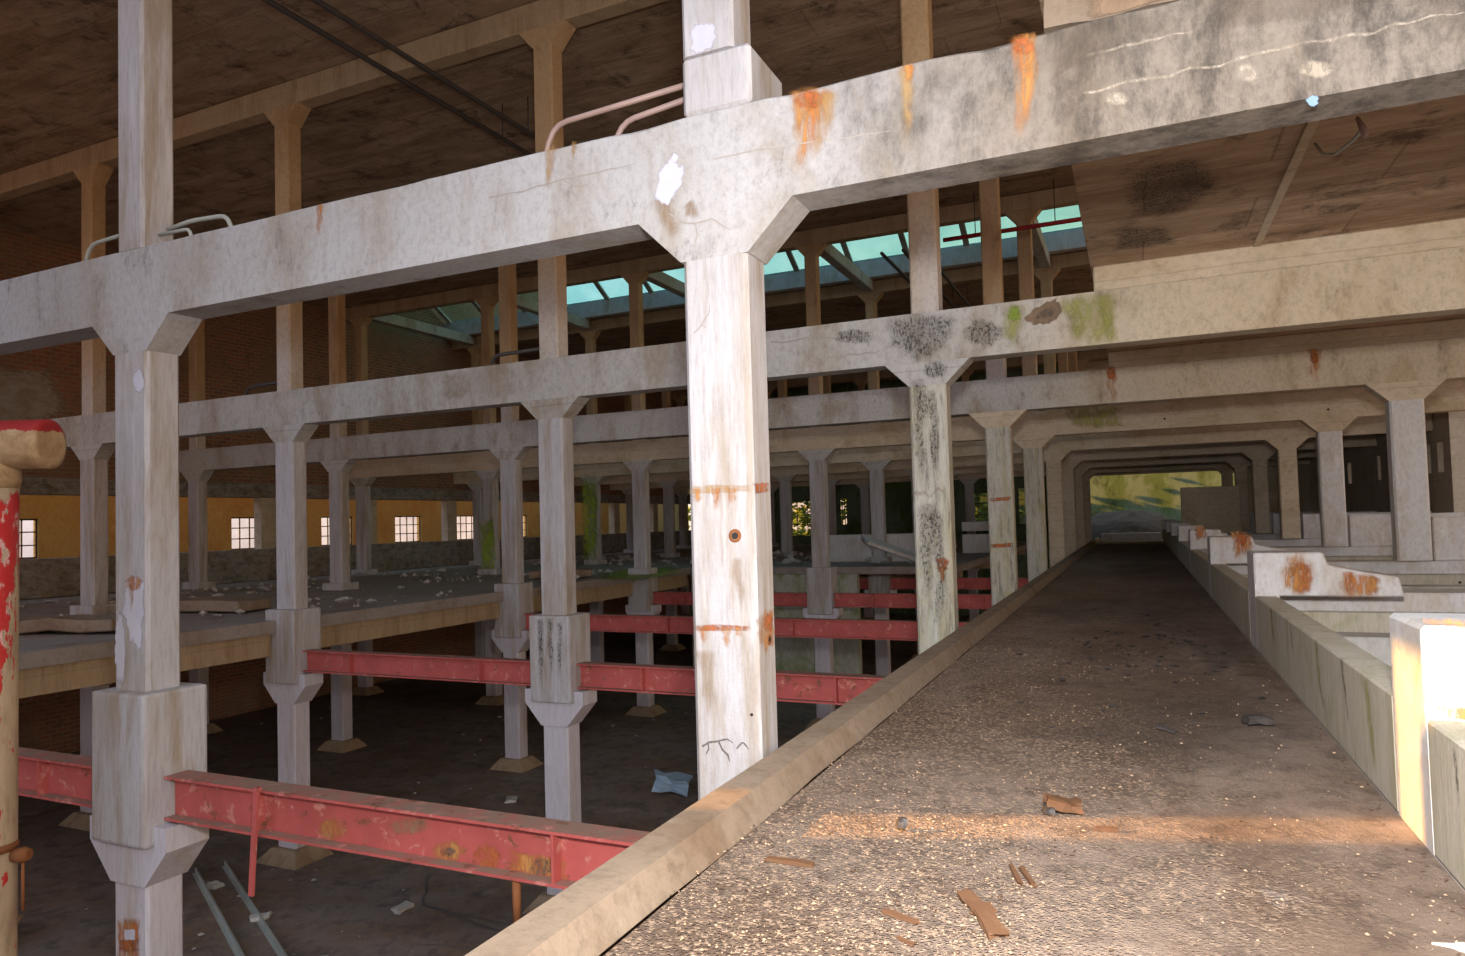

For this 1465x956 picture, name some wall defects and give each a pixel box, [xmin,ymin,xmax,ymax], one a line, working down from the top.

peeling [691,23,716,54]
rust [793,90,833,154]
peeling [655,153,684,205]
mould [968,322,999,345]
mould [893,317,951,464]
rust [695,483,768,504]
leakage [915,488,945,607]
rust [1285,558,1312,592]
rust [1344,572,1378,595]
peeling [115,575,144,682]
rust [697,612,774,650]
rust [118,921,138,956]